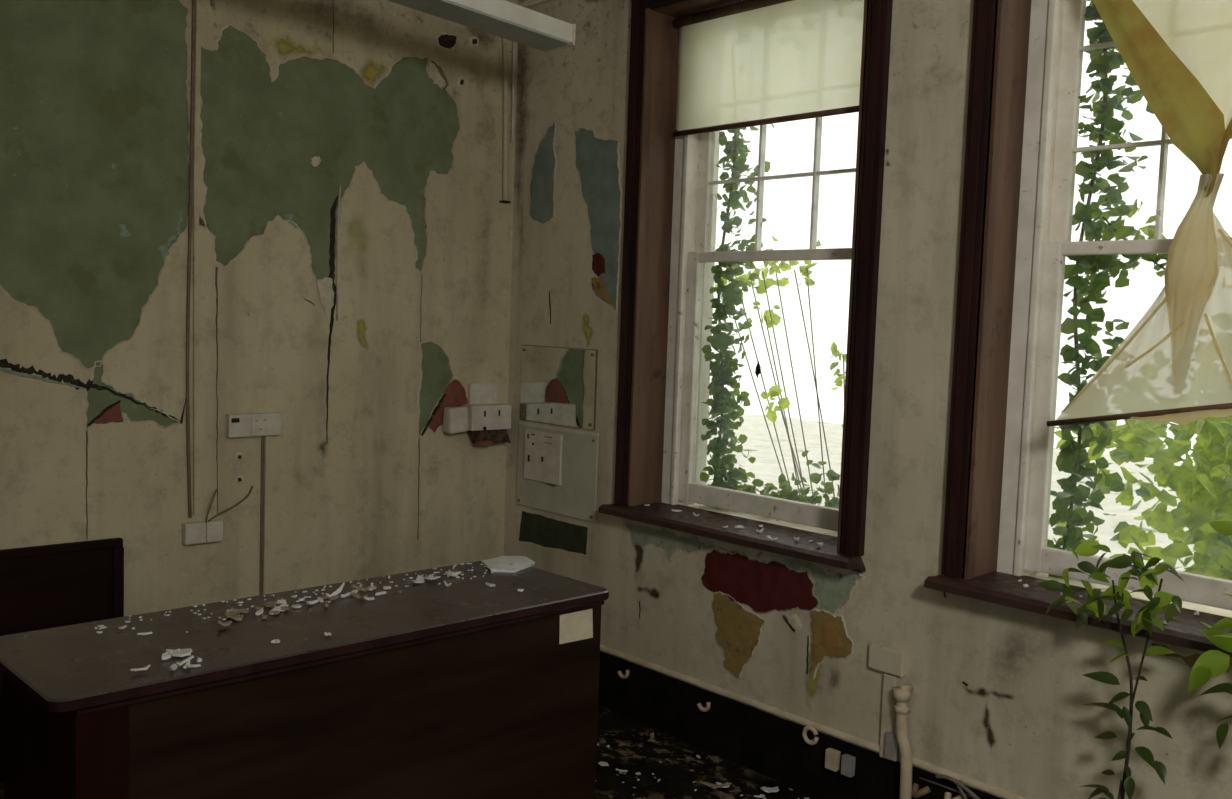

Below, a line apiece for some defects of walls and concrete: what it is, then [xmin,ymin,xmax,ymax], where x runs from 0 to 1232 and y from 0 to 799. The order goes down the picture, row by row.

crack [83,430,91,540]
crack [0,359,186,424]
crack [212,267,220,514]
peeling [0,0,479,438]
crack [305,185,341,443]
peeling [529,120,623,312]
peeling [625,519,865,687]